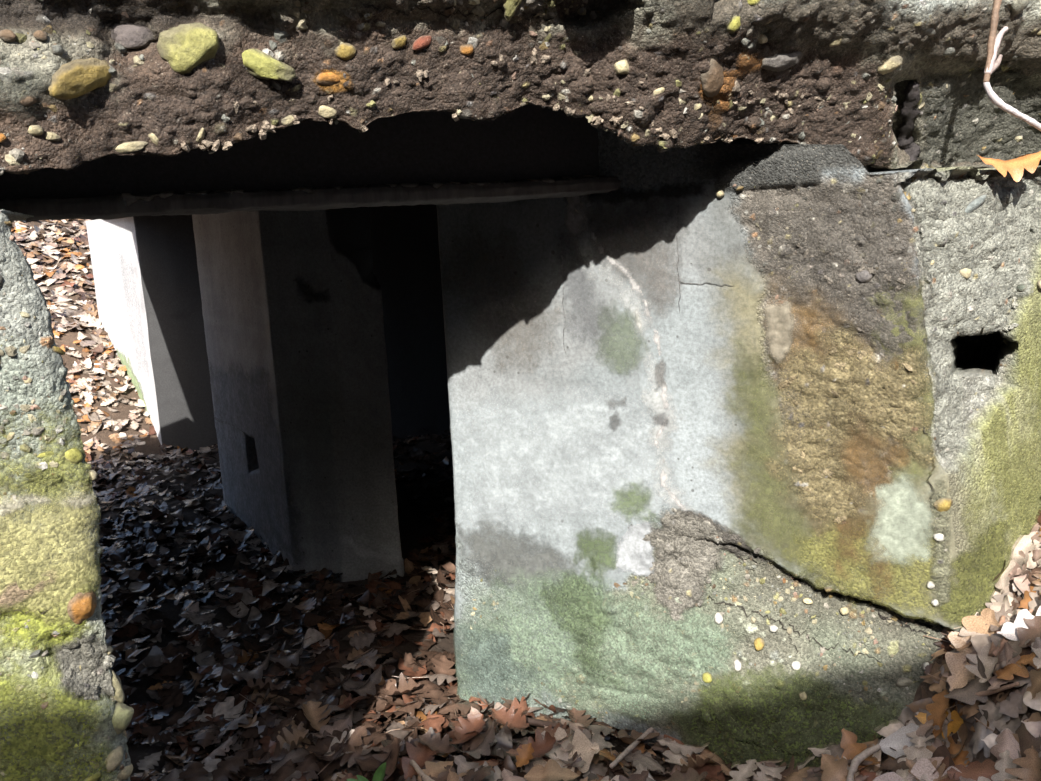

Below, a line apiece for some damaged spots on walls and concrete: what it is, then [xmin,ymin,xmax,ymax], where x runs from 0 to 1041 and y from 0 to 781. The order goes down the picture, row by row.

spalling [68,0,1041,529]
water stain [0,495,46,514]
water stain [68,494,95,505]
spalling [616,508,770,621]
crack [729,551,944,634]